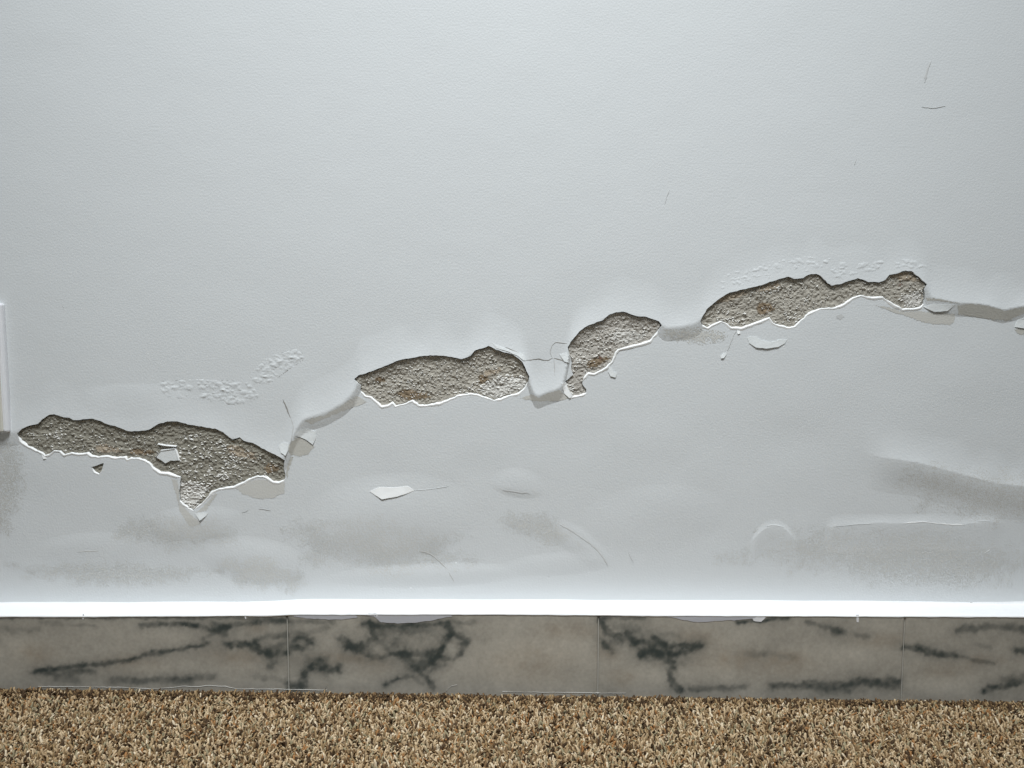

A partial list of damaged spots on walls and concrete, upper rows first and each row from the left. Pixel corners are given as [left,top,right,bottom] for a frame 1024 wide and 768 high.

flaking render [701,271,954,349]
flaking render [355,344,529,409]
flaking render [560,312,661,399]
flaking render [18,414,316,521]
peeling [370,486,414,499]
water stain [2,481,483,598]